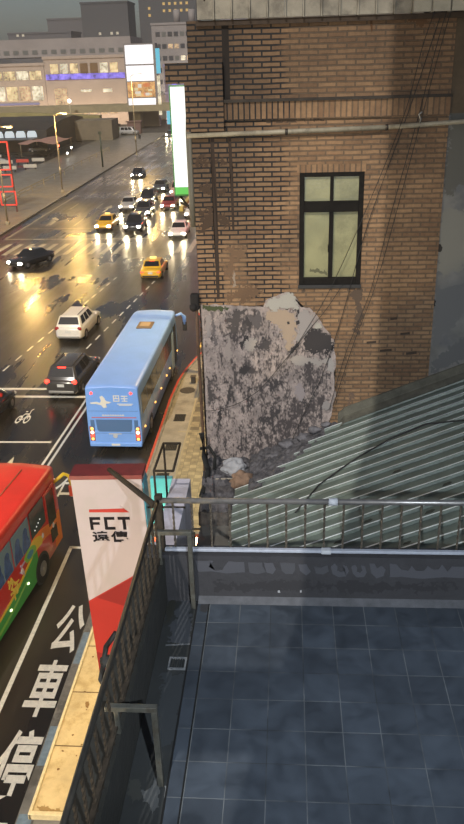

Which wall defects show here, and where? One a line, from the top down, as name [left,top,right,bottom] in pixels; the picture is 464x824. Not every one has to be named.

water stain [443,113,464,196]
peeling [243,337,257,352]
peeling [266,309,335,372]
water stain [204,308,334,459]
peeling [196,561,464,579]